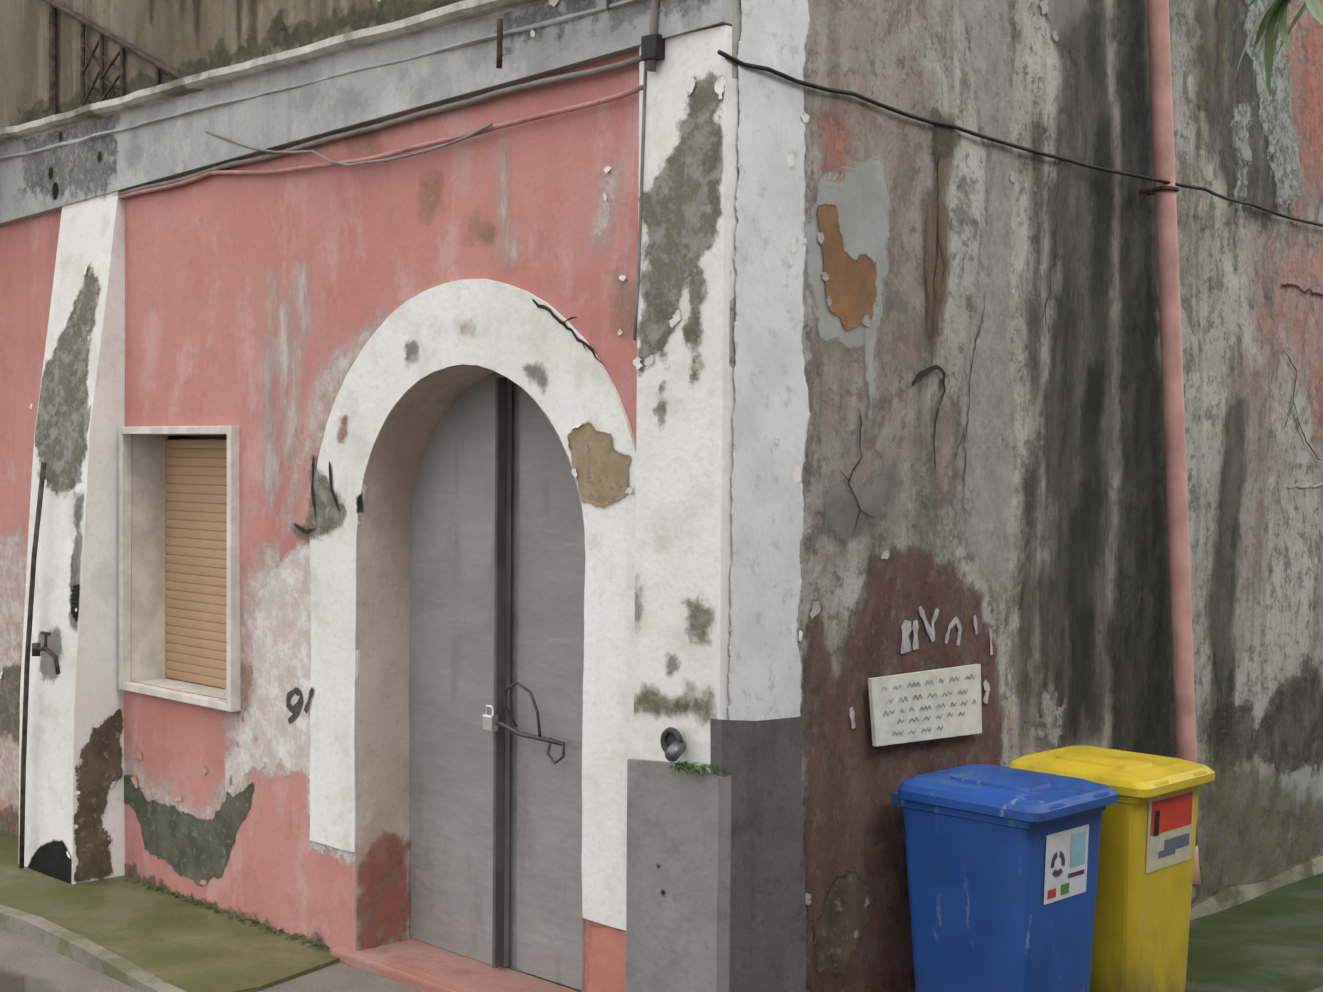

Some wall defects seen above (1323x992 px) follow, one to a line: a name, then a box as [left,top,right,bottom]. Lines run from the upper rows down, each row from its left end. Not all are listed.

water stain [1199,0,1307,269]
peeling [27,543,311,884]
peeling [264,267,384,531]
flaking render [565,422,632,508]
peeling [669,310,681,328]
peeling [714,0,891,721]
water stain [818,462,900,542]
water stain [1022,0,1176,758]
water stain [1205,398,1323,818]
peeling [310,840,356,865]